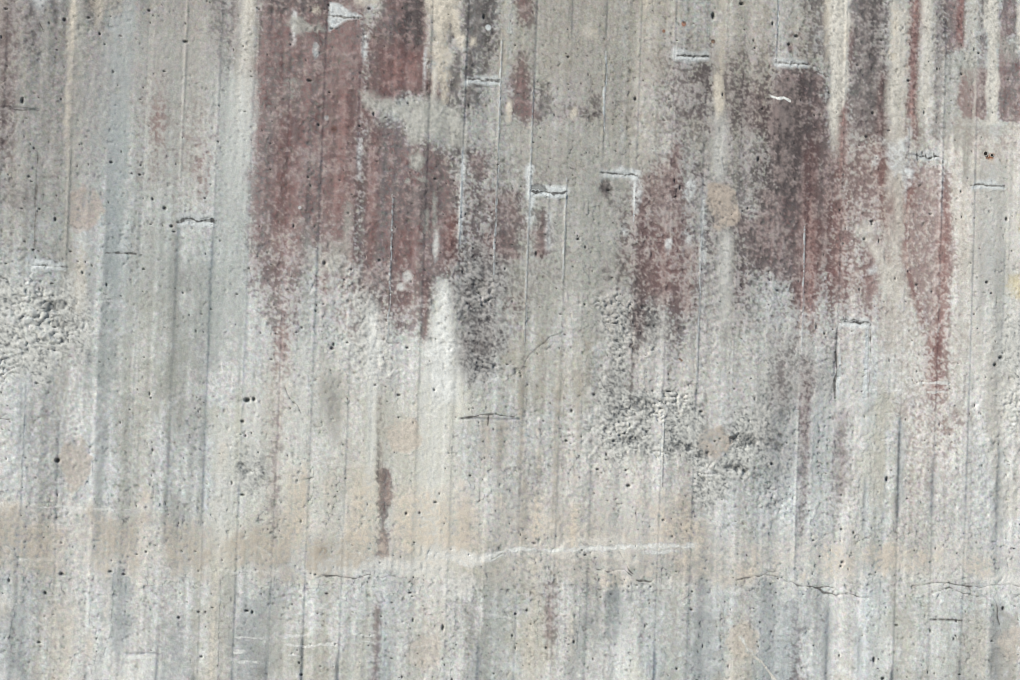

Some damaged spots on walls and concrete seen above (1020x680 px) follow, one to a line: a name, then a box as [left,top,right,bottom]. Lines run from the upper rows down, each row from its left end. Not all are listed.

crack [595,551,653,583]
crack [734,570,871,598]